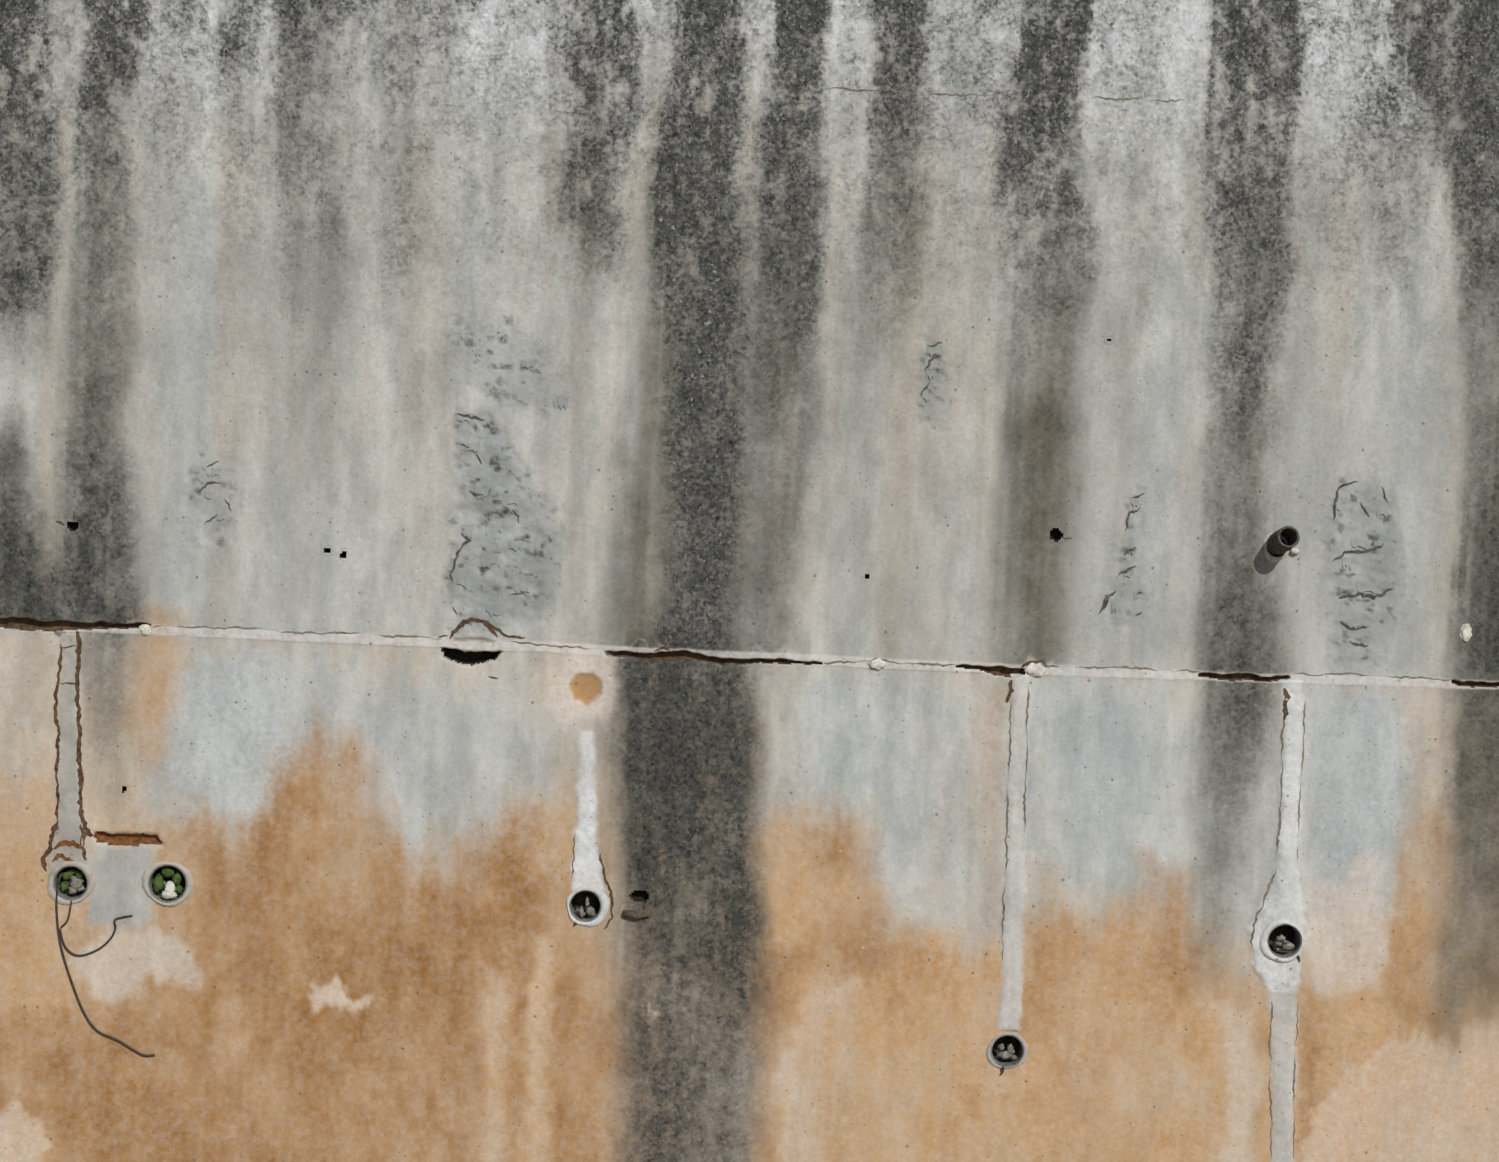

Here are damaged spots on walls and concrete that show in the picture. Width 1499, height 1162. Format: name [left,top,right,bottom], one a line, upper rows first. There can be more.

water stain [68,926,141,994]
corrosion [119,595,197,785]
water stain [0,0,429,823]
corrosion [0,687,627,1162]
peeling [438,310,578,679]
water stain [441,0,1499,1162]
corrosion [750,675,1272,1162]
peeling [1318,468,1407,676]
corrosion [1292,687,1499,1162]